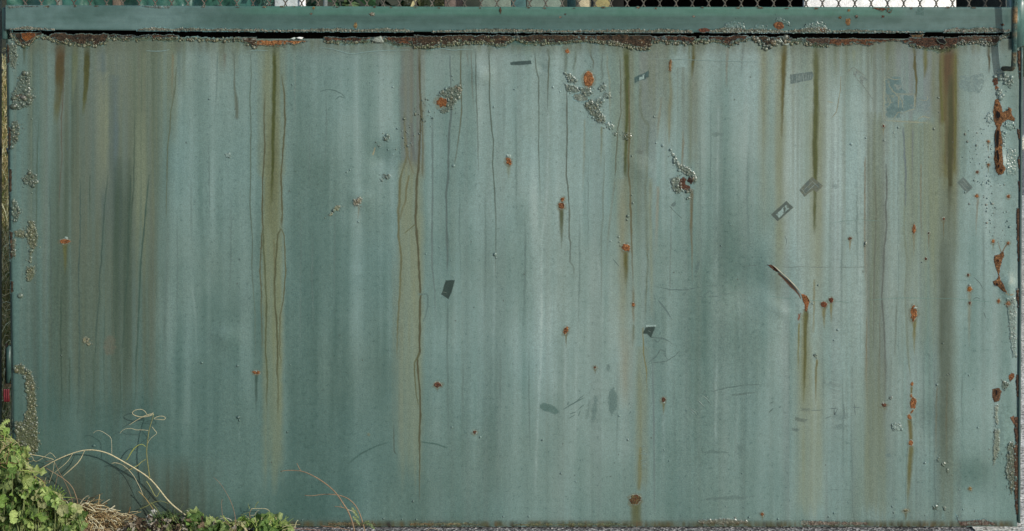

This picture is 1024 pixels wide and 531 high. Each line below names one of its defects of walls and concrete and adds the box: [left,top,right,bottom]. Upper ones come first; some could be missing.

corrosion [6,31,306,65]
corrosion [322,9,1010,56]
corrosion [580,68,597,89]
corrosion [555,195,568,251]
corrosion [974,98,1020,308]
corrosion [900,381,918,522]
corrosion [513,492,645,527]